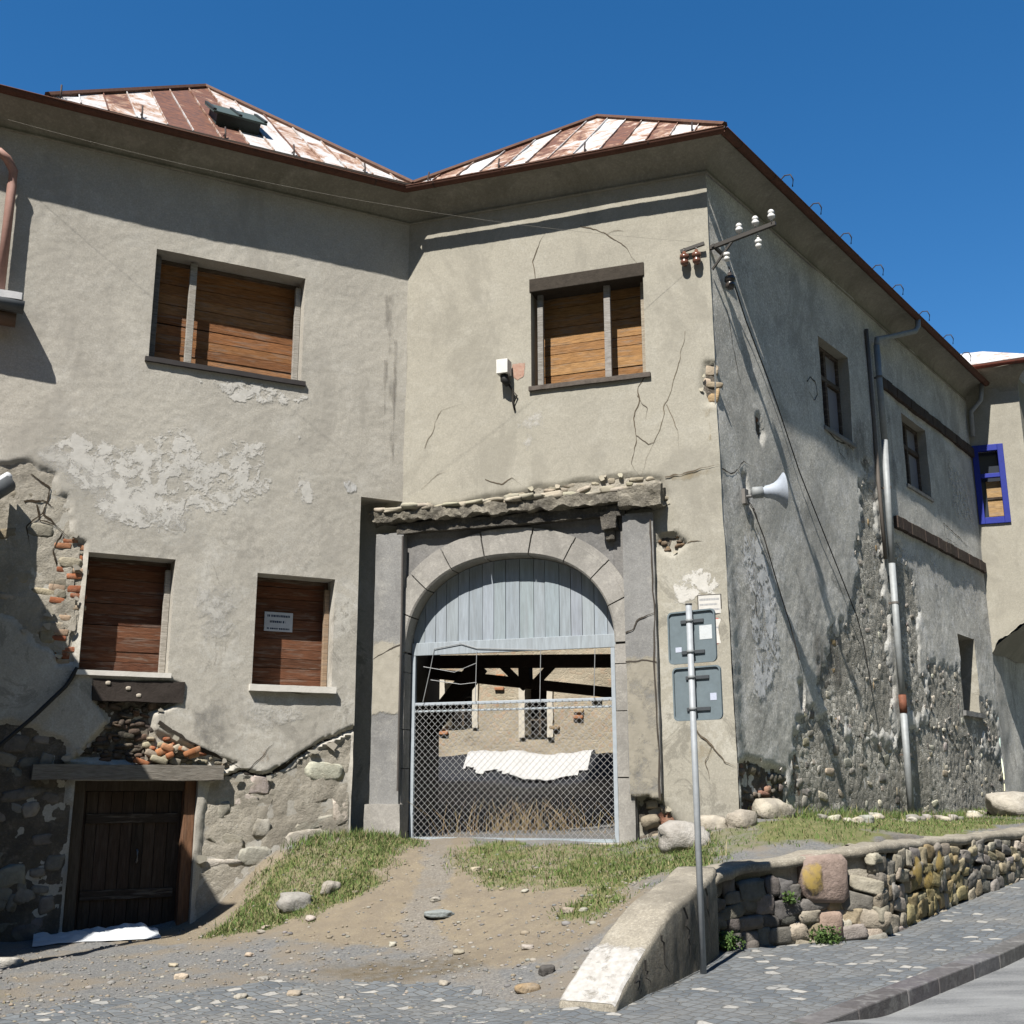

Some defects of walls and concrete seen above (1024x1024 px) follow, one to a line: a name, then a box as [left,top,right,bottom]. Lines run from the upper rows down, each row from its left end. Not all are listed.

crack [580,225,637,263]
peeling [200,379,308,405]
crack [631,339,751,478]
flaking render [699,365,723,402]
flaking render [0,427,272,664]
flaking render [658,536,685,554]
peeling [673,568,719,604]
crack [625,520,661,798]
flaking render [737,459,1005,816]
crack [158,721,353,803]
flaking render [0,701,351,942]